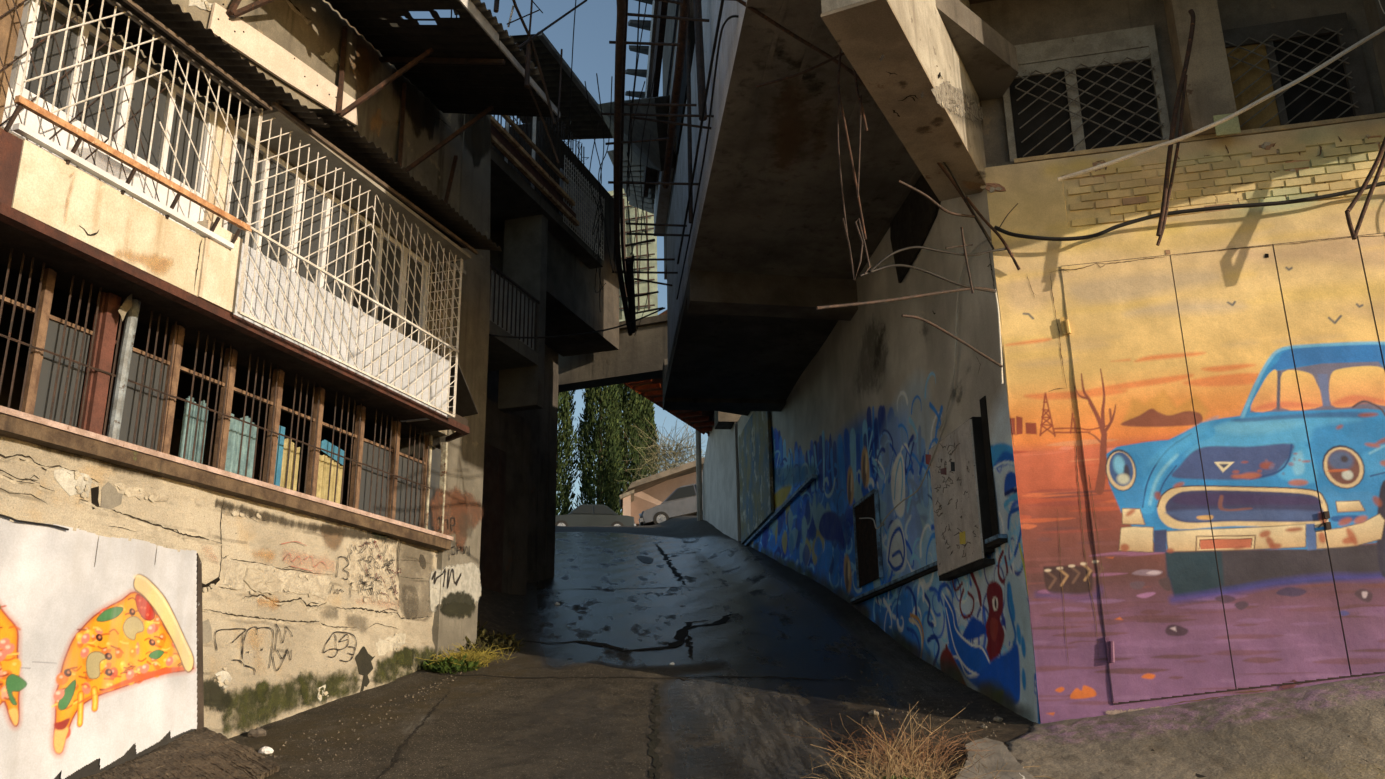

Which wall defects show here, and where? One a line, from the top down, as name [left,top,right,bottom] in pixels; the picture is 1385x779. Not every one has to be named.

peeling [54,467,170,509]
crack [0,454,432,631]
spalling [202,538,400,605]
peeling [375,632,406,656]
water stain [397,648,414,668]
peeling [215,667,232,689]
water stain [255,681,269,703]
water stain [298,673,313,700]